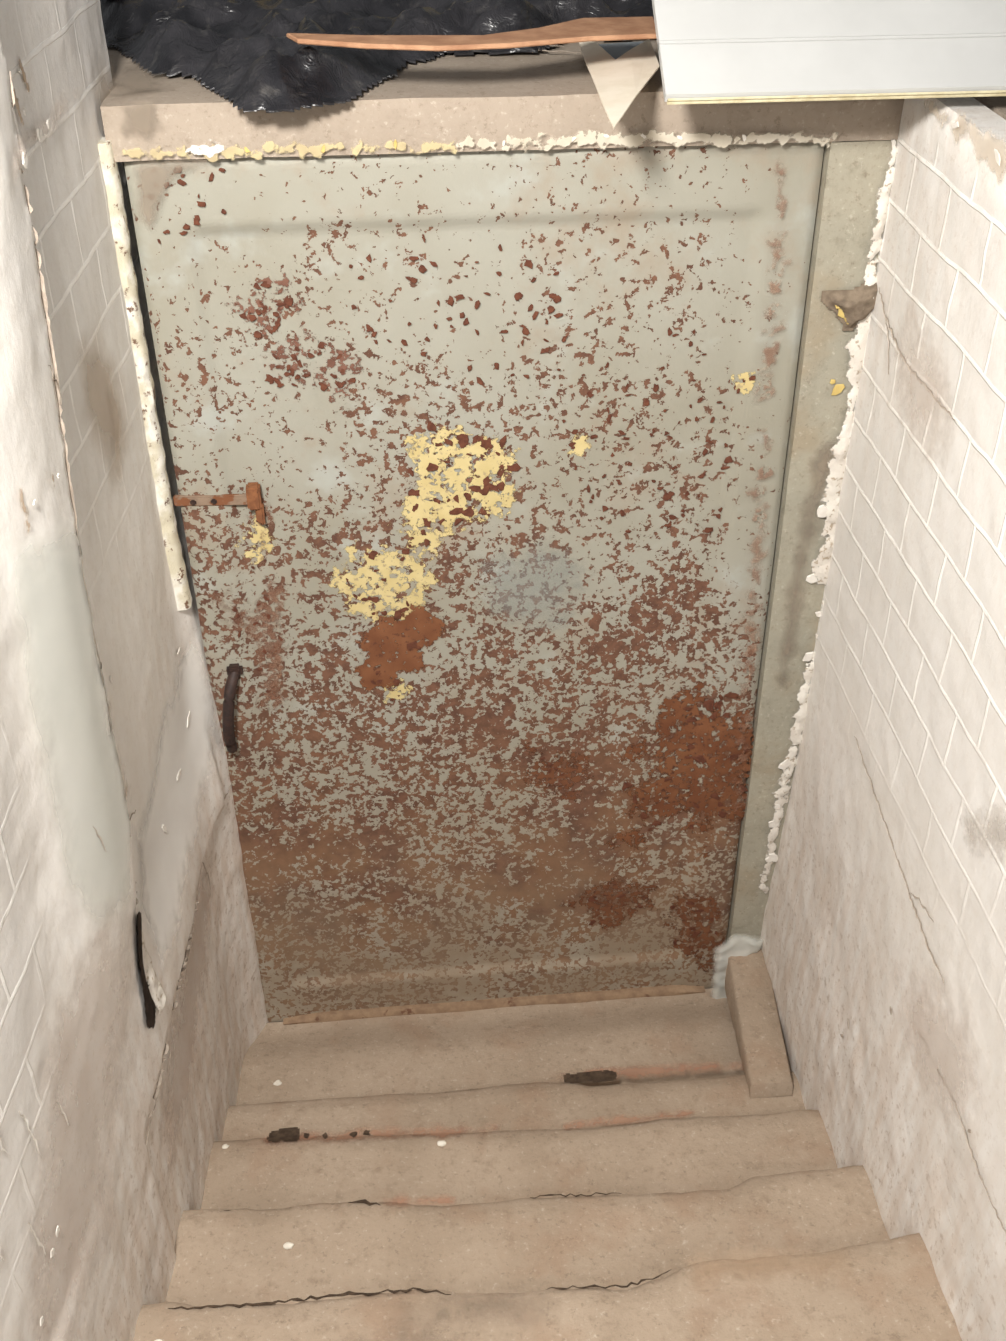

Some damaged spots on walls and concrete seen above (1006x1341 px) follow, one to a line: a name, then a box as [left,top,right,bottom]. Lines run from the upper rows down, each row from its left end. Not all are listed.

rust [157,168,226,244]
rust [226,272,379,414]
rust [366,292,491,357]
rust [500,259,568,354]
rust [424,428,512,502]
peeling [328,421,521,625]
peeling [759,139,898,894]
rust [352,603,446,691]
rust [604,467,773,860]
rust [562,878,726,973]
crack [168,1287,451,1310]
crack [546,1270,670,1290]